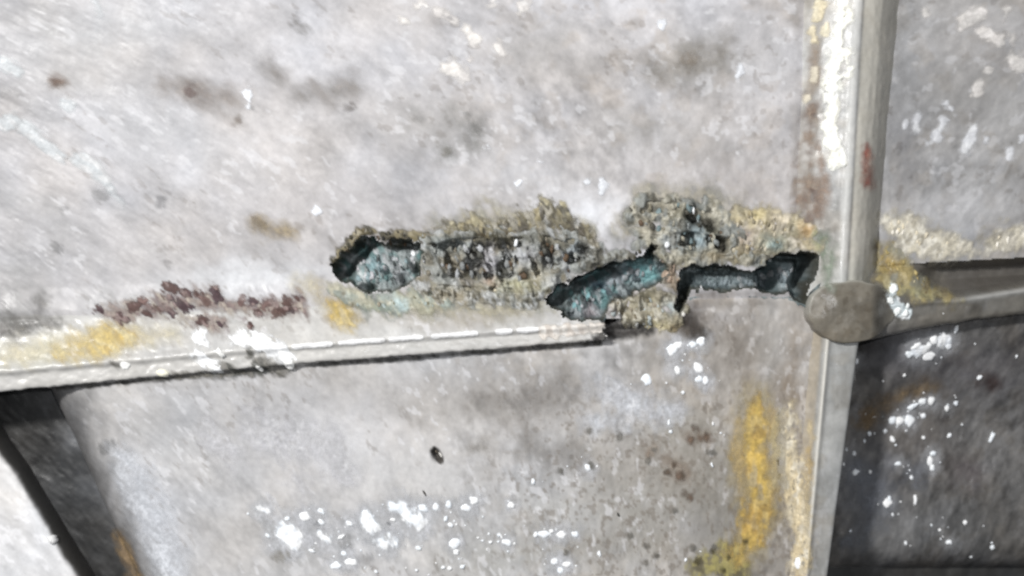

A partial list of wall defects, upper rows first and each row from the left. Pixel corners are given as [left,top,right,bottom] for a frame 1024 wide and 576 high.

rust [810,46,820,84]
rust [805,103,817,118]
peeling [336,228,415,284]
rust [53,163,829,358]
peeling [568,250,652,309]
peeling [700,266,793,289]
rust [874,242,963,303]
peeling [538,322,605,340]
rust [663,462,690,480]
rust [689,395,778,576]